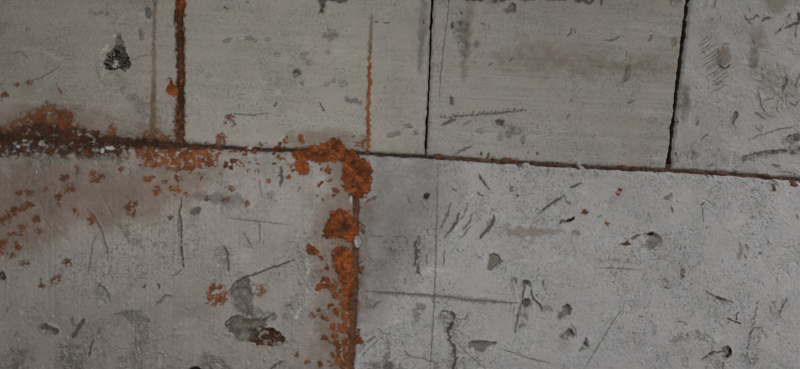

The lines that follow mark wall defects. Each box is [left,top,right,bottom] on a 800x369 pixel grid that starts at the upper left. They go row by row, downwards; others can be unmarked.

spalling [96,33,150,108]
rust [0,0,377,369]
spalling [225,251,316,346]